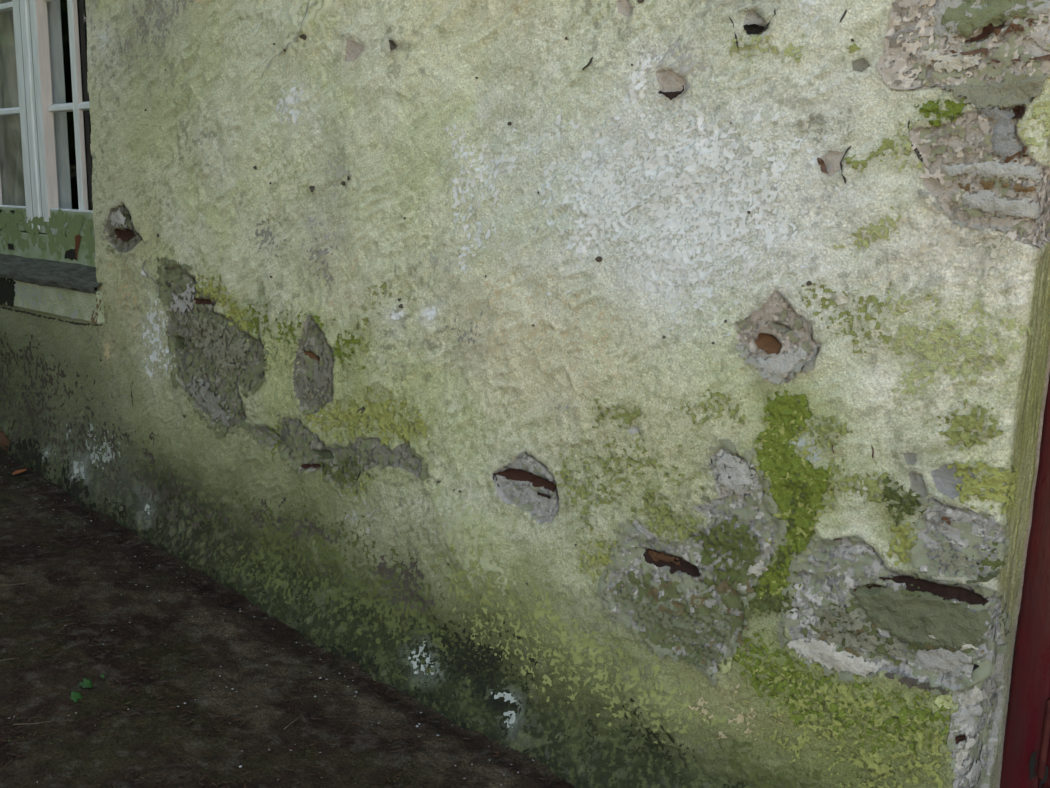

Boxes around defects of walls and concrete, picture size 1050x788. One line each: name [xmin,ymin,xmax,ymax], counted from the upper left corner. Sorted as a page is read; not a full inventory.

spalling [852,0,1050,248]
spalling [103,204,142,252]
damp [105,255,174,377]
spalling [155,257,430,489]
spalling [735,290,821,385]
damp [244,488,377,549]
spalling [491,452,559,523]
damp [791,433,822,463]
damp [212,553,697,788]
spalling [596,439,1010,788]